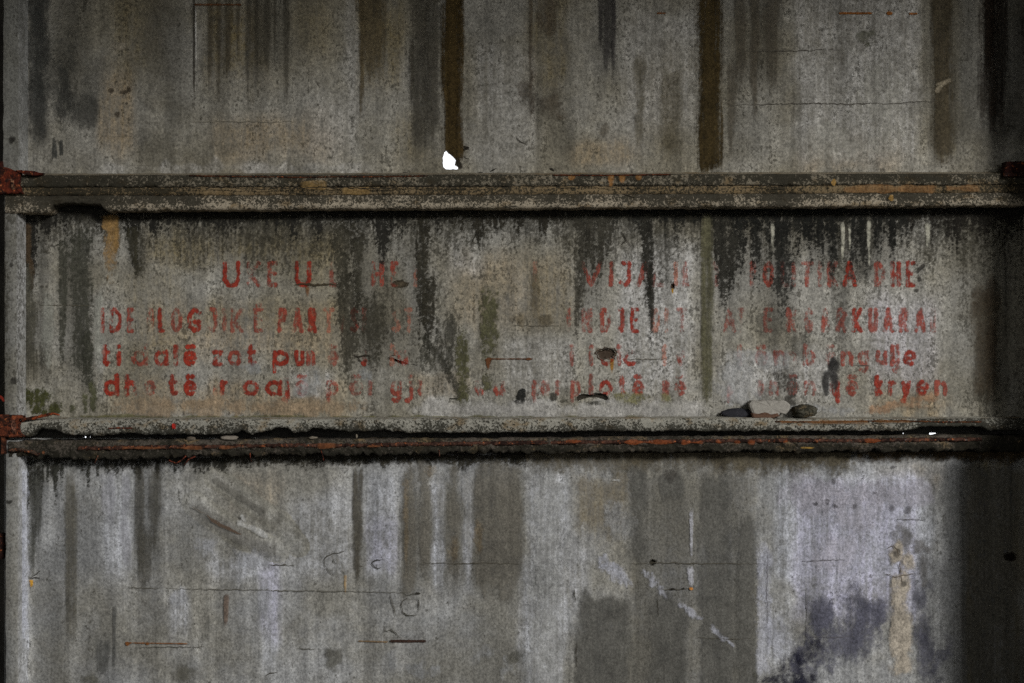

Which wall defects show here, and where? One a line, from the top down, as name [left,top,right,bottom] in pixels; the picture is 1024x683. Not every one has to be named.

water stain [52,139,63,158]
water stain [355,0,385,111]
water stain [410,0,465,164]
water stain [598,0,616,68]
water stain [697,0,724,172]
crack [743,99,933,107]
water stain [930,0,953,163]
water stain [978,0,1008,132]
water stain [26,205,1024,417]
spalling [594,346,618,370]
water stain [22,449,1024,683]